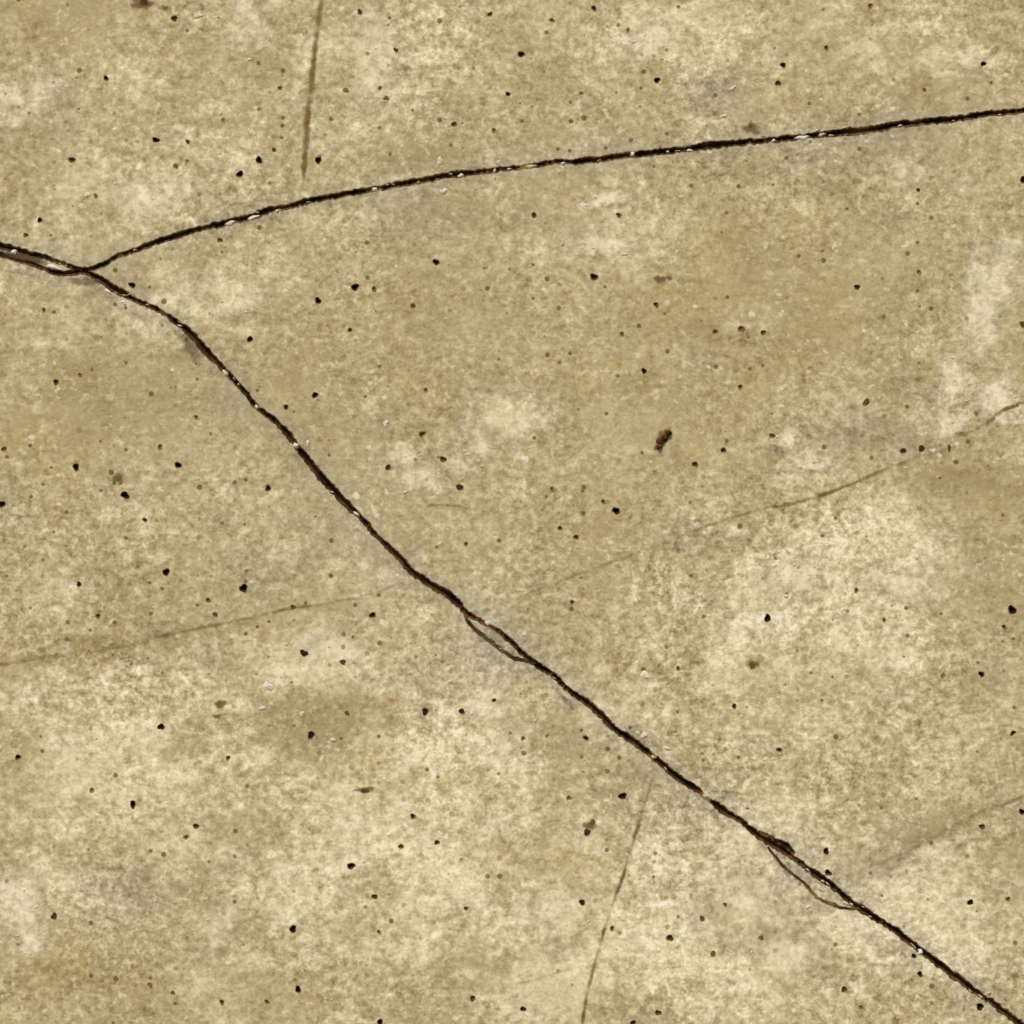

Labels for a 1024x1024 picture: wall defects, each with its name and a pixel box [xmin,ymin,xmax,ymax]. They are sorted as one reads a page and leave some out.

crack [0,107,1024,276]
crack [83,269,1024,1024]